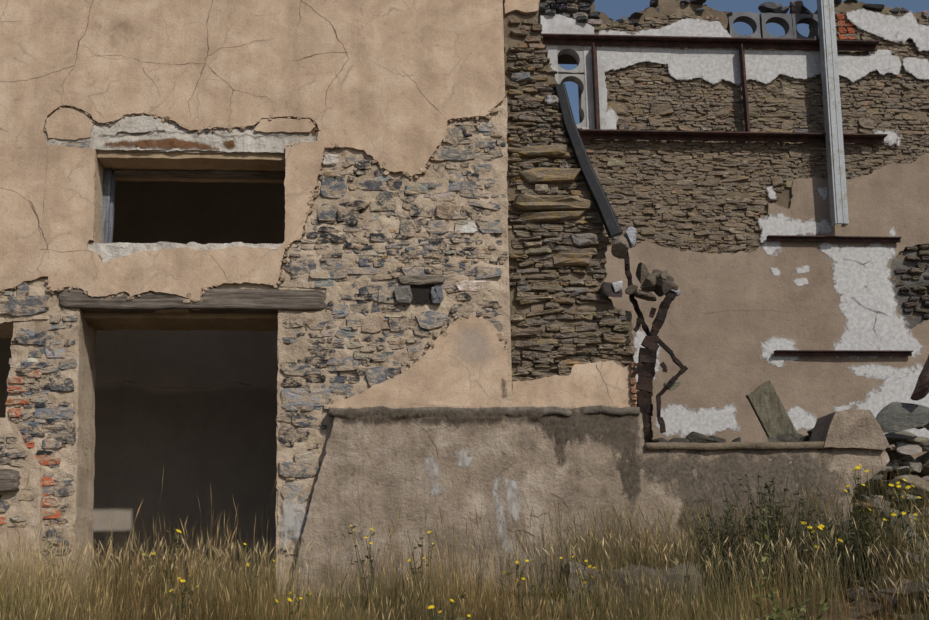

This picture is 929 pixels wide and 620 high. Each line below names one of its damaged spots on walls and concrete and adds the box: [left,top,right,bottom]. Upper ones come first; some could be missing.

crack [0,0,309,141]
flaking render [44,103,321,153]
crack [292,1,349,115]
peeling [540,14,731,37]
peeling [546,45,822,130]
peeling [837,9,929,82]
crack [3,150,96,268]
flaking render [88,98,509,594]
peeling [758,213,929,418]
flaking render [0,278,144,595]
water stain [332,407,641,501]
peeling [655,404,740,438]